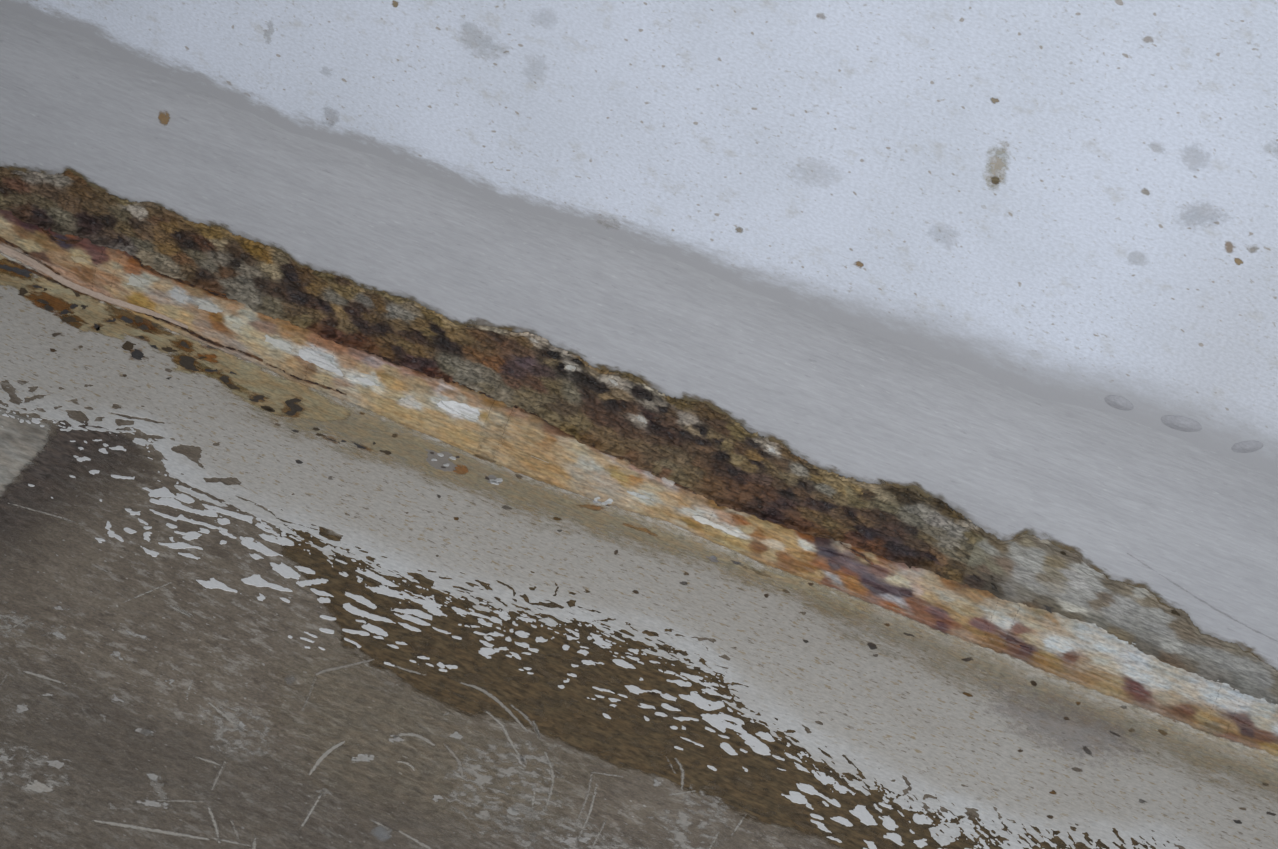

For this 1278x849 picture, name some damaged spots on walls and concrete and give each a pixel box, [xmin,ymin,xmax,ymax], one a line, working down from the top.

rust [0,209,1278,757]
water stain [277,509,1166,849]